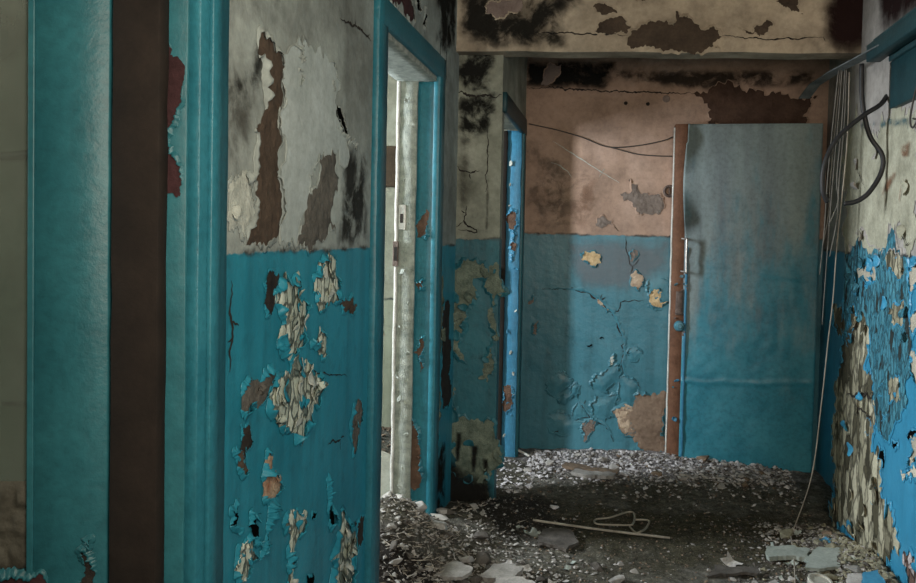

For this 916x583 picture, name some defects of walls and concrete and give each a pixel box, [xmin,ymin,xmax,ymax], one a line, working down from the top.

peeling [484,0,523,20]
flaking render [593,2,726,56]
flaking render [775,0,804,15]
flaking render [621,178,666,216]
peeling [227,25,359,583]
peeling [439,257,516,497]
flaking render [580,250,602,268]
crack [542,286,642,390]
flaking render [628,249,669,309]
peeling [819,103,916,583]
flaking render [610,379,679,452]
peeling [326,472,366,583]